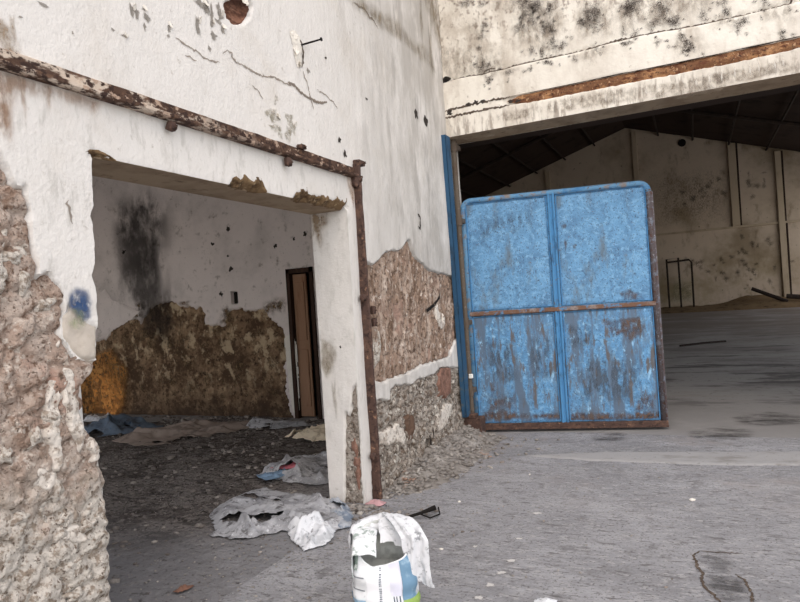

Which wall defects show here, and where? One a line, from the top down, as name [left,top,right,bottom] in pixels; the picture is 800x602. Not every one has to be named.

spalling [196,0,249,51]
crack [176,38,338,109]
damp [457,23,511,85]
damp [516,0,572,73]
damp [577,3,606,33]
corrosion [512,36,800,104]
damp [619,0,694,56]
spalling [291,187,347,211]
spalling [0,169,300,602]
spalling [345,242,464,503]
crack [692,551,741,602]
crack [735,574,754,602]